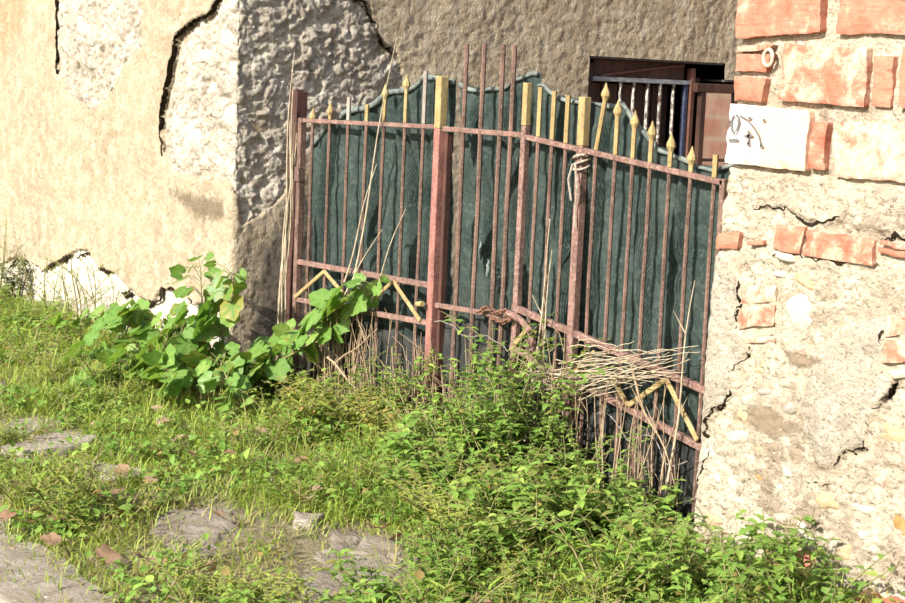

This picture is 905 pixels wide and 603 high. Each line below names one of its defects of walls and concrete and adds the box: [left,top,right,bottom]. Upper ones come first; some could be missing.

flaking render [57,0,143,109]
flaking render [165,0,404,223]
crack [354,0,393,55]
flaking render [725,0,905,183]
crack [753,204,880,266]
flaking render [0,250,198,332]
crack [696,281,751,482]
crack [805,383,899,486]